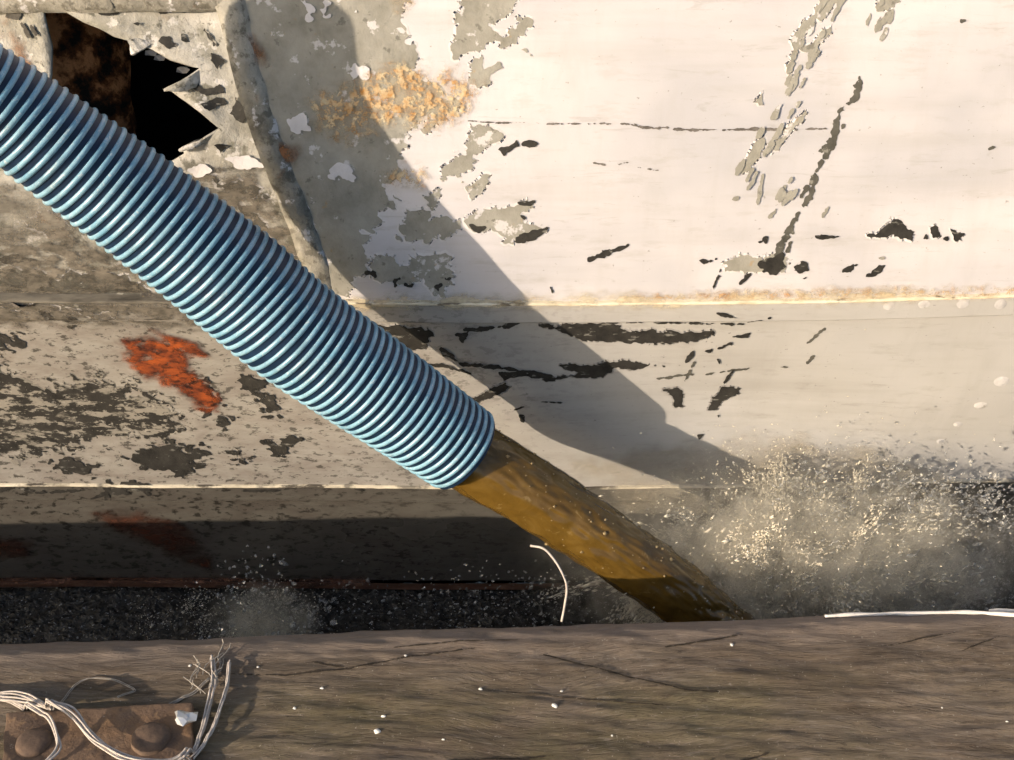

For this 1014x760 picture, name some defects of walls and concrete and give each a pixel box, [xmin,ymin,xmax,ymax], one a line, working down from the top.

peeling [192,84,246,123]
rust [311,64,475,138]
peeling [732,0,846,205]
peeling [187,144,271,238]
peeling [245,0,549,300]
peeling [699,236,809,289]
peeling [865,216,966,243]
peeling [0,330,212,500]
rust [121,330,217,412]
peeling [235,374,282,419]
peeling [225,435,303,466]
peeling [376,312,771,418]